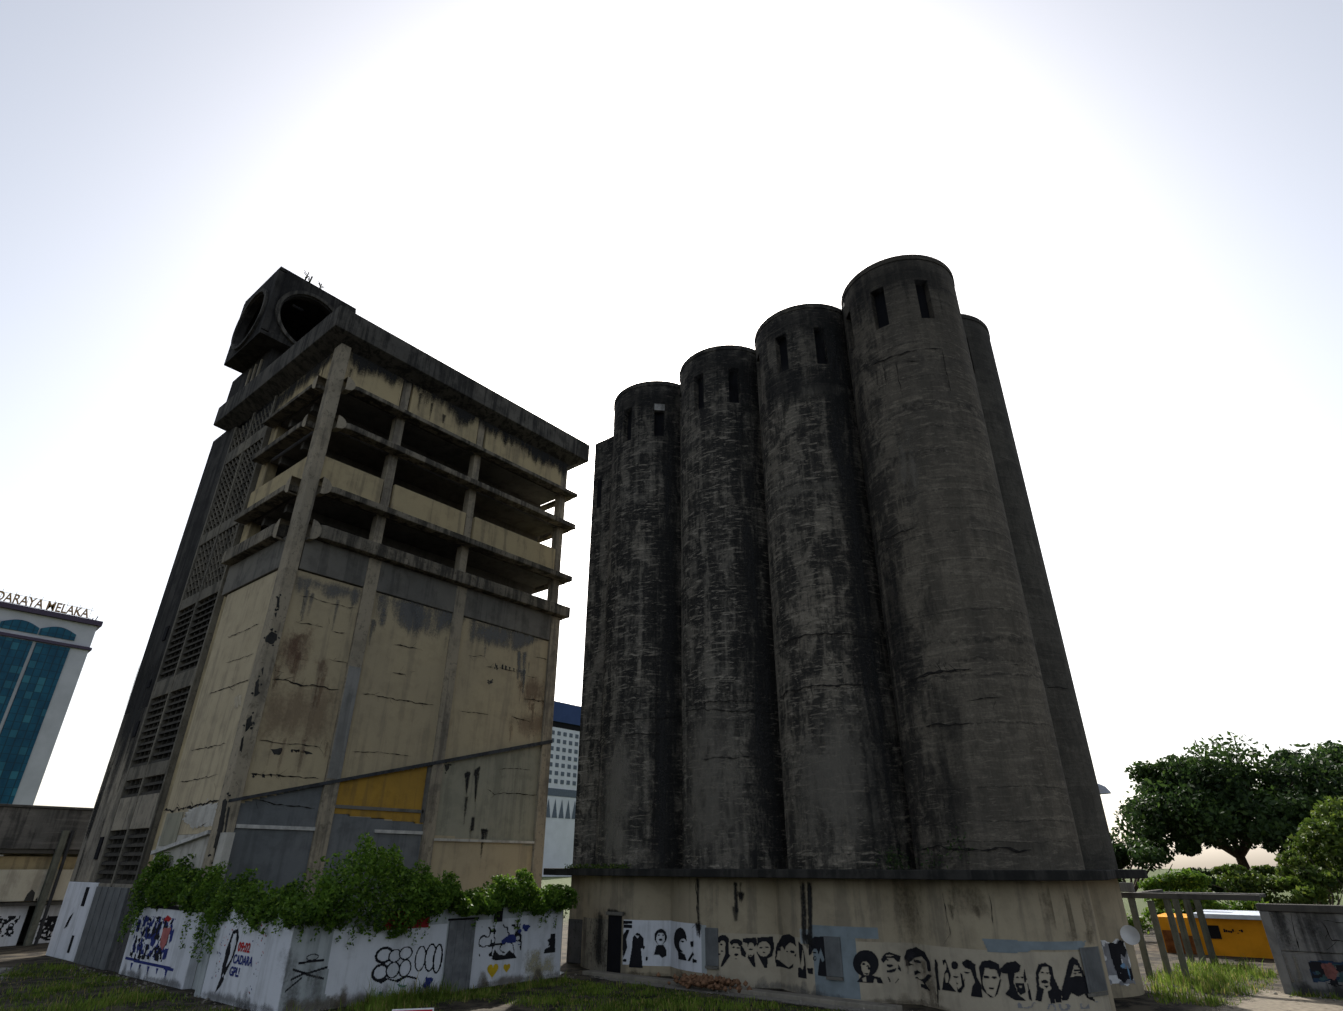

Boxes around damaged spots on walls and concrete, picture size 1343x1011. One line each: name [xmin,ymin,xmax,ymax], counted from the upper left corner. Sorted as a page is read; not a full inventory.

damp [241,353,334,437]
damp [349,351,572,477]
damp [370,595,452,634]
damp [600,321,911,869]
damp [470,619,535,679]
damp [733,882,743,920]
damp [800,882,812,947]